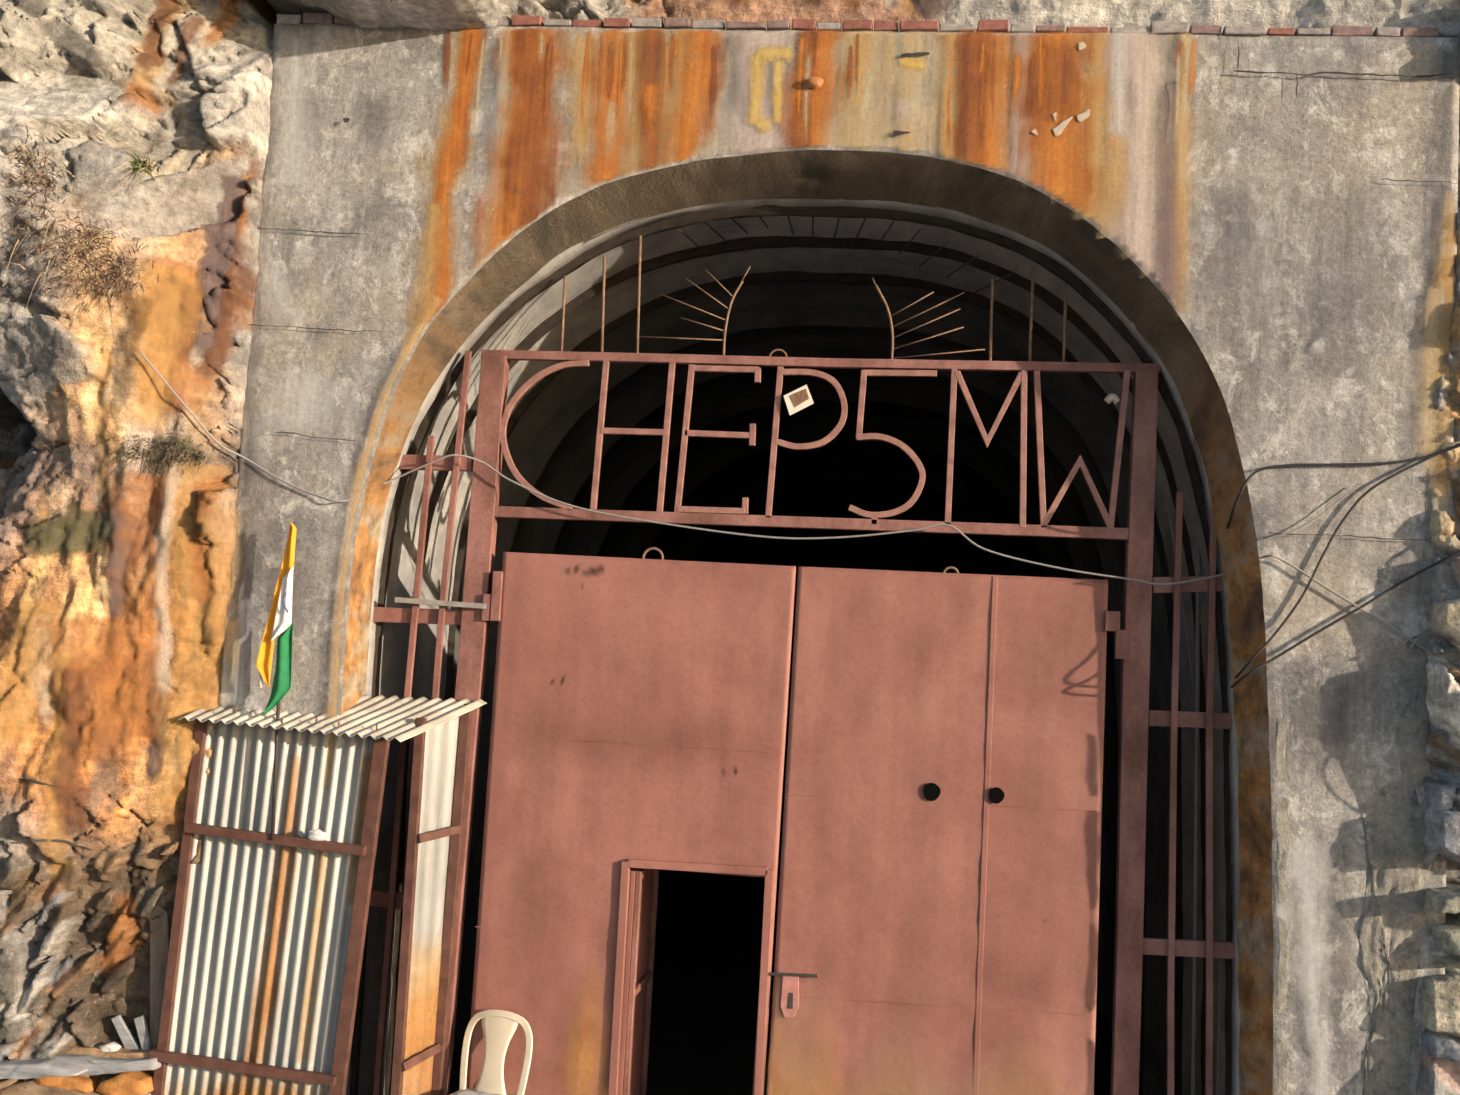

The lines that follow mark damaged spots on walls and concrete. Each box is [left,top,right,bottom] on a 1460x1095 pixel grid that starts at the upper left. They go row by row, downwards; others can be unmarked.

rust [749,30,867,146]
rust [941,31,1115,228]
peeling [1031,109,1090,136]
rust [1159,34,1196,305]
rust [327,28,730,786]
rust [1422,204,1454,489]
rust [247,757,296,1063]
rust [312,852,323,950]
rust [351,756,372,902]
rust [221,1084,289,1095]
rust [402,958,441,1095]